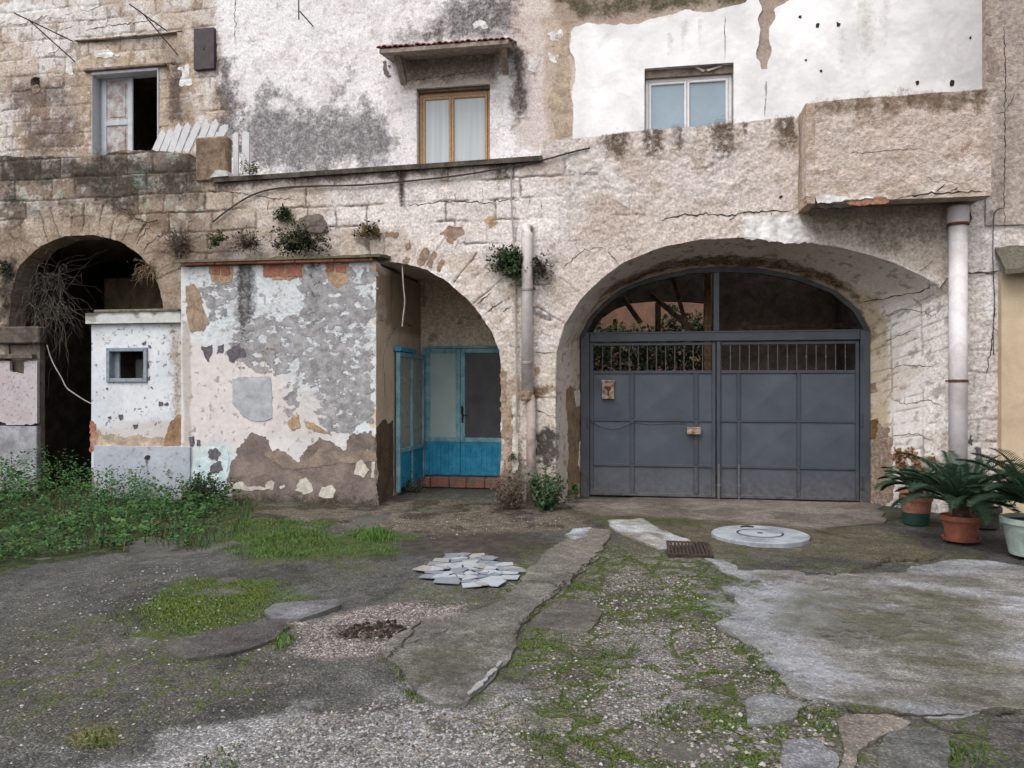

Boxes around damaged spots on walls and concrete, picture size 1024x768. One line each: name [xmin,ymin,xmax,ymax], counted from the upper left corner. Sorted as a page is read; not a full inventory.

damp [511,48,527,114]
damp [216,58,470,206]
damp [712,122,747,151]
damp [778,117,794,146]
crack [900,20,1014,235]
spalling [371,225,445,272]
spalling [440,225,465,244]
crack [662,207,797,221]
crack [861,259,937,341]
peeling [89,262,394,505]
peeling [565,385,581,500]